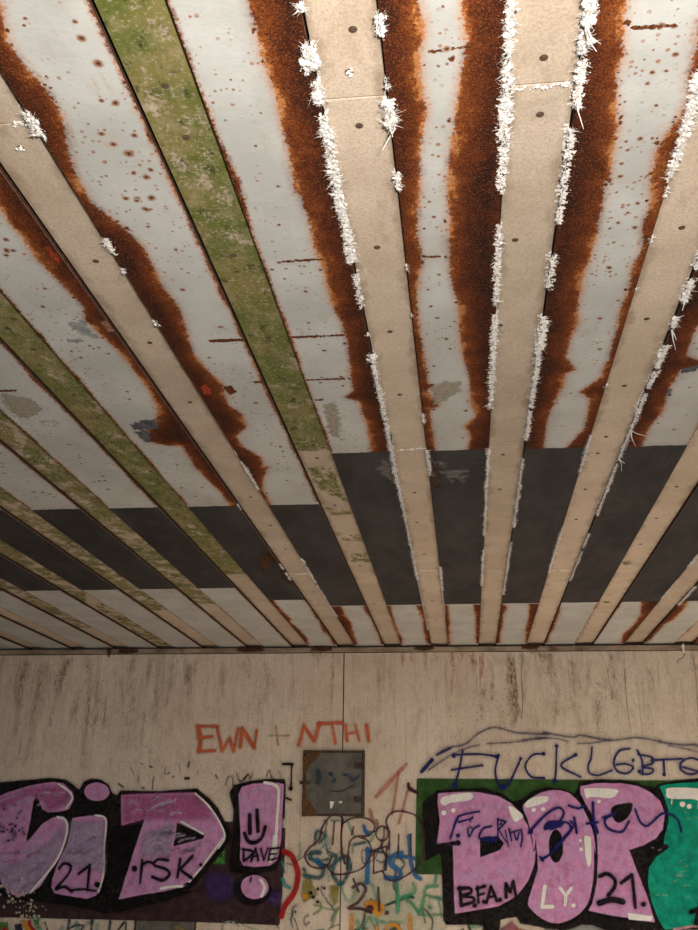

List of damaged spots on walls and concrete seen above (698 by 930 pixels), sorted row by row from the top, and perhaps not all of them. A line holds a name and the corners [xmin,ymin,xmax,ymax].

leakage [12,103,47,142]
rust [0,0,318,509]
rust [167,0,391,453]
leakage [298,37,366,310]
leakage [375,76,405,151]
rust [378,0,510,451]
leakage [485,219,505,410]
leakage [522,313,550,441]
leakage [494,0,600,224]
rust [525,0,698,449]
leakage [596,250,698,516]
leakage [660,69,698,198]